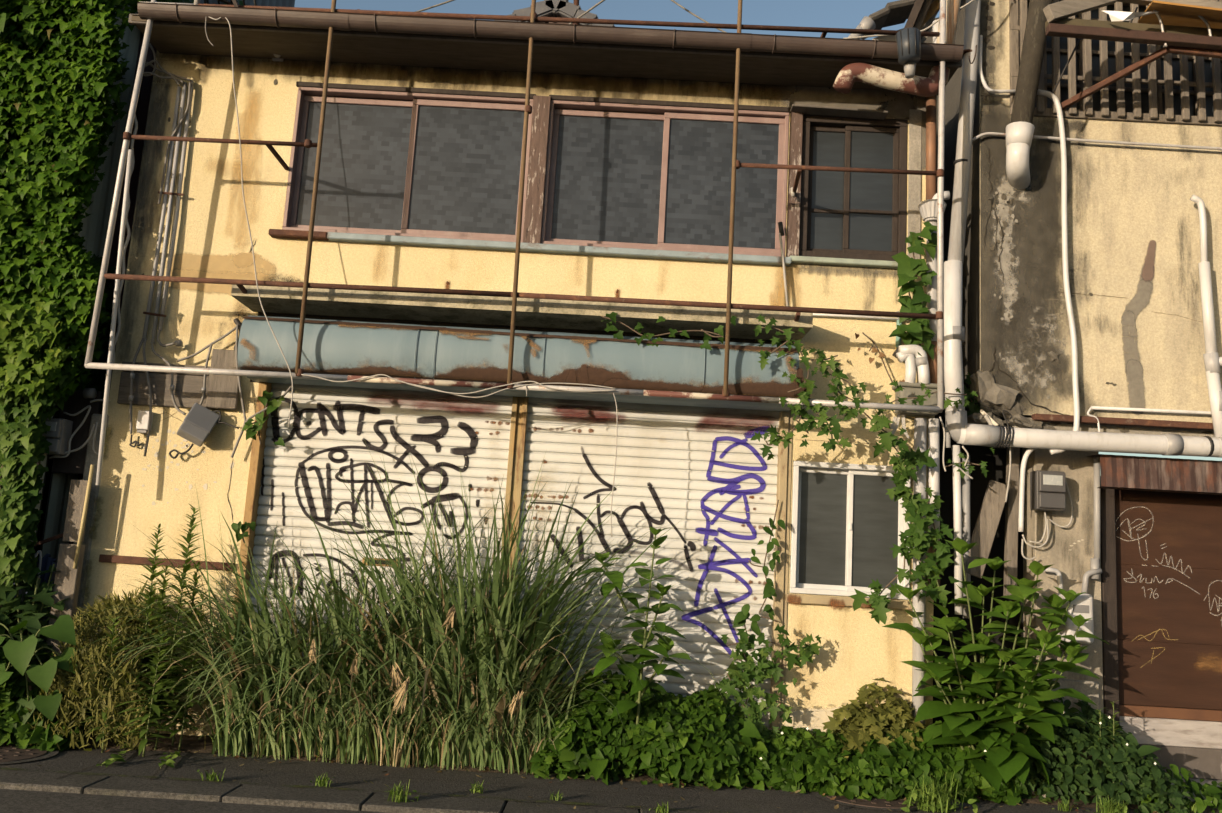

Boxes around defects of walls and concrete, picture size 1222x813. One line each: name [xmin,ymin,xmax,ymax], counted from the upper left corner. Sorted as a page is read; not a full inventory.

damp [159,53,926,171]
damp [120,77,170,359]
peeling [989,177,1028,325]
corrosion [234,316,807,399]